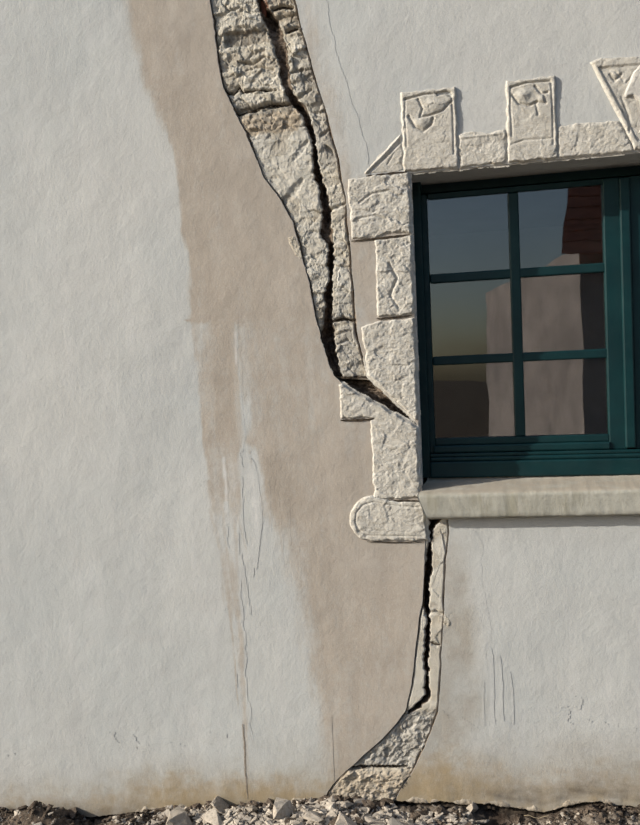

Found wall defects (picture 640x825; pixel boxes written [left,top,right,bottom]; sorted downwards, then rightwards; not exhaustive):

leakage [114,0,425,782]
spalling [211,0,369,380]
crack [210,0,416,424]
spalling [328,518,451,801]
crack [291,519,620,818]